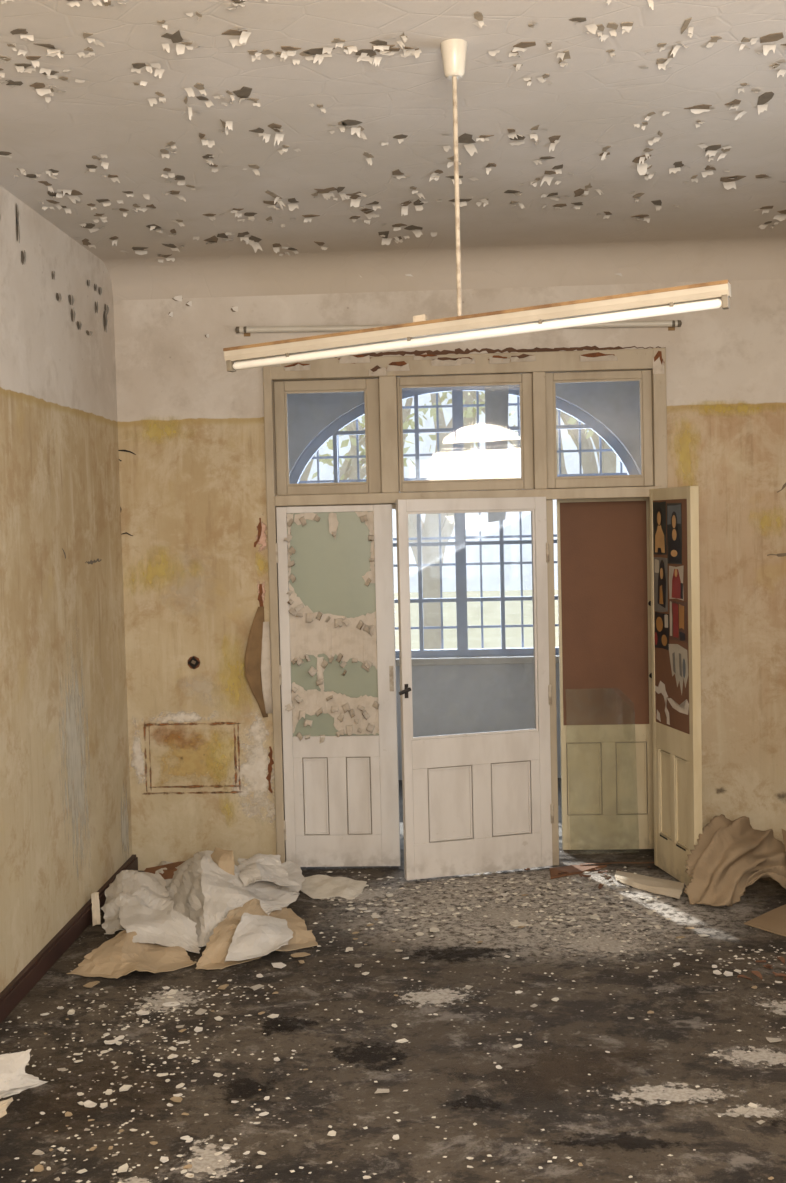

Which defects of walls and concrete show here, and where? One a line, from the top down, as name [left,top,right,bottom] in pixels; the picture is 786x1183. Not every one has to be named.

peeling [0,29,104,103]
peeling [131,63,166,106]
peeling [157,20,202,55]
peeling [182,83,260,120]
peeling [221,29,422,67]
peeling [569,17,633,57]
peeling [684,83,774,128]
peeling [739,32,786,78]
peeling [0,141,320,265]
peeling [311,119,603,245]
peeling [630,111,785,223]
peeling [284,511,379,743]